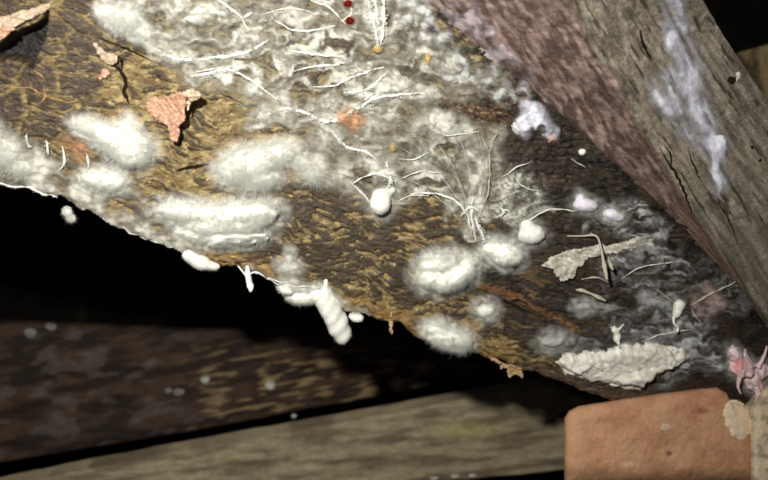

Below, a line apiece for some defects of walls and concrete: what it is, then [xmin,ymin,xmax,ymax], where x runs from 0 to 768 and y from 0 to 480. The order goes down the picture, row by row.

peeling [0,1,54,42]
crack [92,36,160,104]
peeling [146,87,202,142]
damp [0,0,689,296]
damp [652,0,726,194]
crack [660,144,738,245]
damp [24,323,56,340]
damp [250,253,364,345]
damp [419,318,476,358]
damp [477,303,494,320]
damp [541,280,768,404]